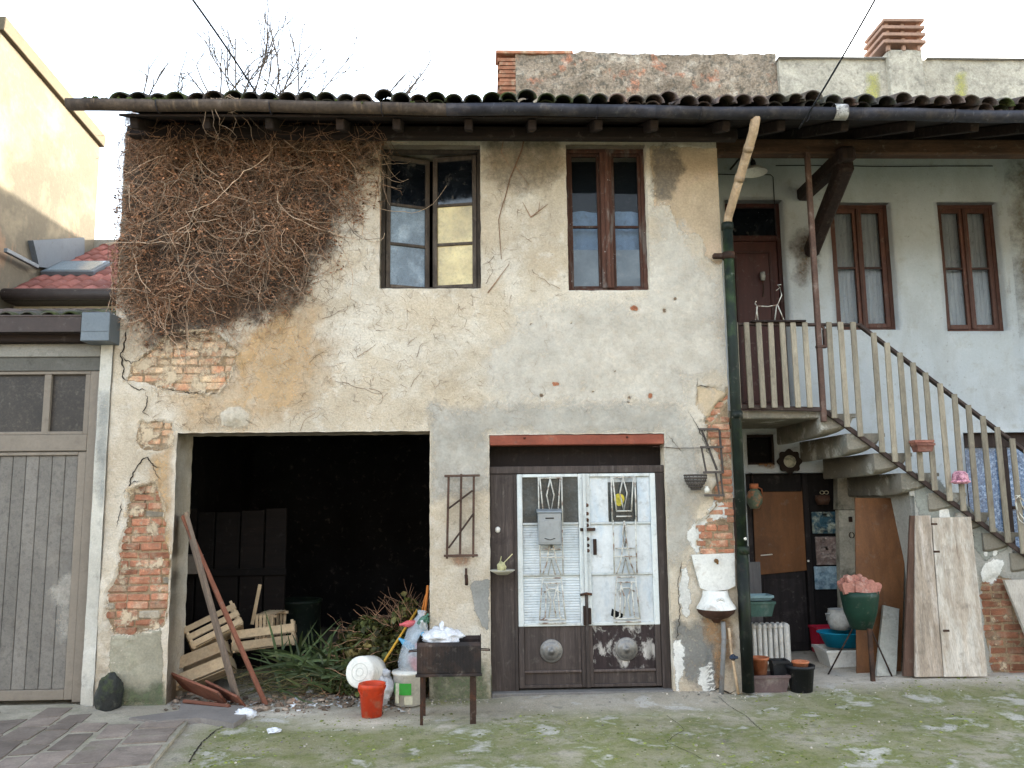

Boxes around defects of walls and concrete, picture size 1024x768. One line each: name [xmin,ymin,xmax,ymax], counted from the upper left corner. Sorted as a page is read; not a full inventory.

damp [653,147,685,198]
crack [120,332,216,419]
spalling [123,329,239,396]
spalling [136,421,175,451]
crack [116,457,162,527]
spalling [679,386,735,617]
peeling [915,479,974,518]
spalling [106,478,170,637]
spalling [972,520,1024,673]
peeling [673,640,685,691]
peeling [697,662,716,691]